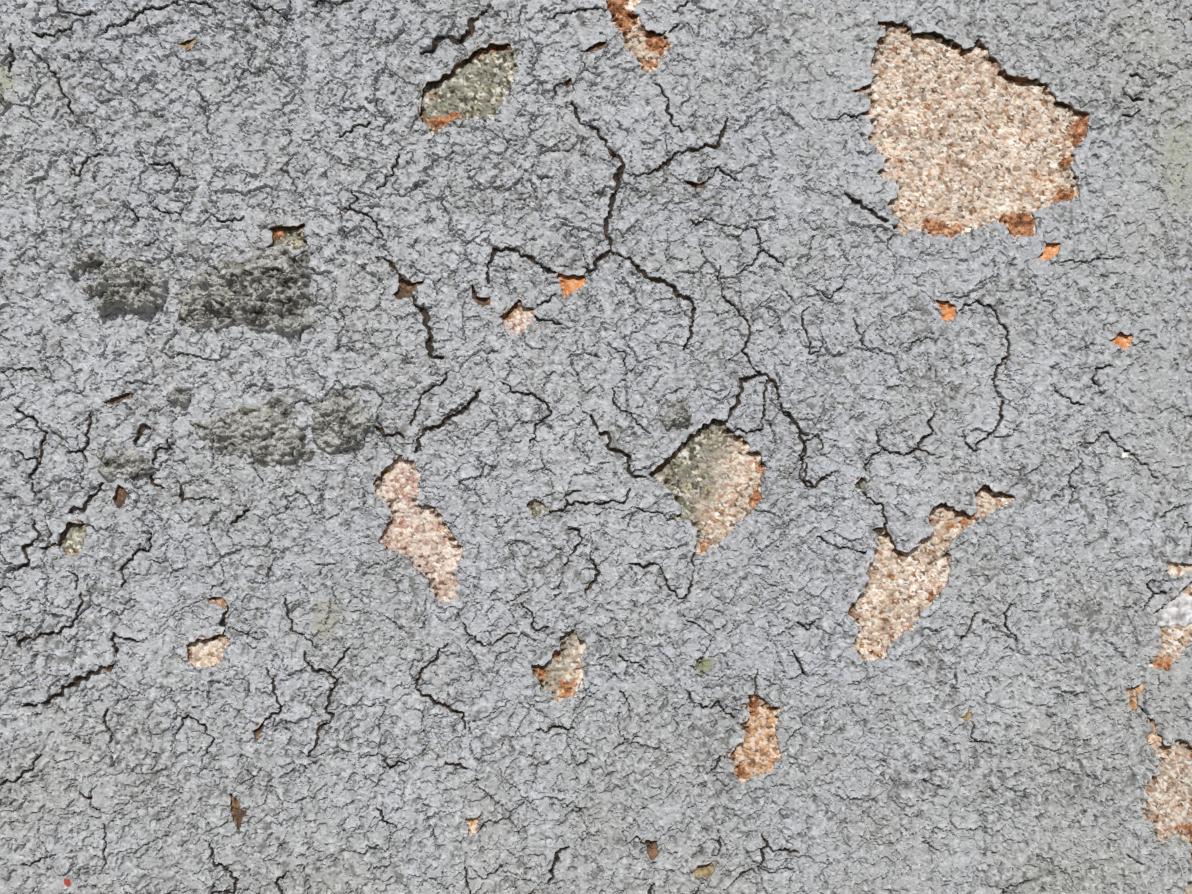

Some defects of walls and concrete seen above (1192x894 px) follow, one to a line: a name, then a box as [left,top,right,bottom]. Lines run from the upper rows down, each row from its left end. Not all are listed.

crack [0,408,104,591]
crack [22,633,139,707]
peeling [367,456,463,603]
crack [339,154,552,453]
peeling [412,35,519,135]
crack [548,342,674,594]
crack [486,83,738,350]
peeling [581,0,673,73]
crack [692,218,936,555]
peeling [841,480,1015,661]
peeling [853,14,1090,260]
peeling [1126,556,1192,894]